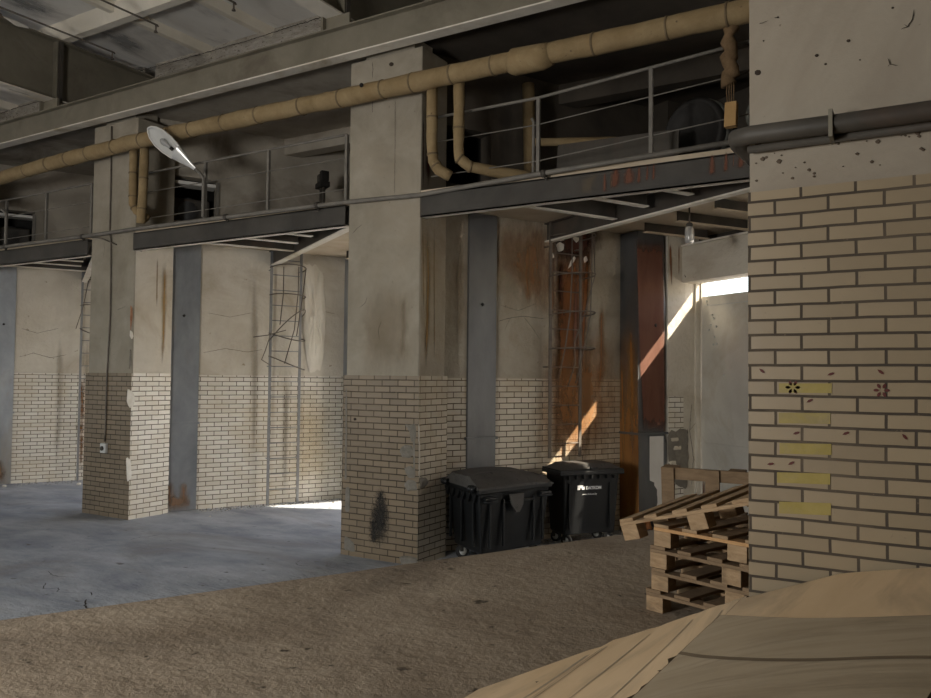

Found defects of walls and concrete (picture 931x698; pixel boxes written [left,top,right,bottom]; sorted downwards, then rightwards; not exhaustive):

rust [156,265,166,351]
rust [504,233,603,441]
rust [620,244,680,519]
spalling [667,429,689,468]
damp [371,491,388,541]